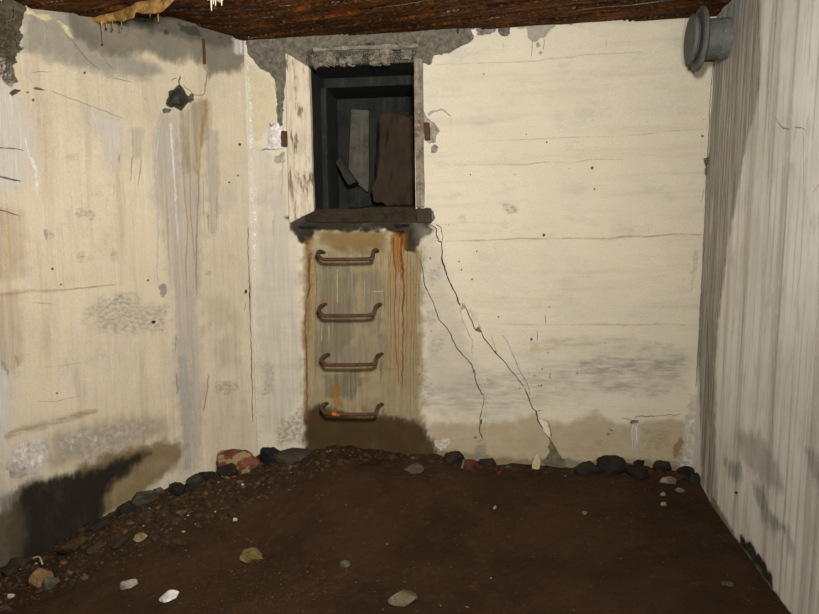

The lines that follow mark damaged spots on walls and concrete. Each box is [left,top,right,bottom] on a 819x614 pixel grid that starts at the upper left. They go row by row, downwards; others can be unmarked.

spalling [0,0,510,126]
spalling [520,25,555,55]
spalling [424,109,451,153]
corrosion [381,234,418,390]
crack [416,223,566,468]
damp [304,405,455,456]
damp [0,440,188,568]